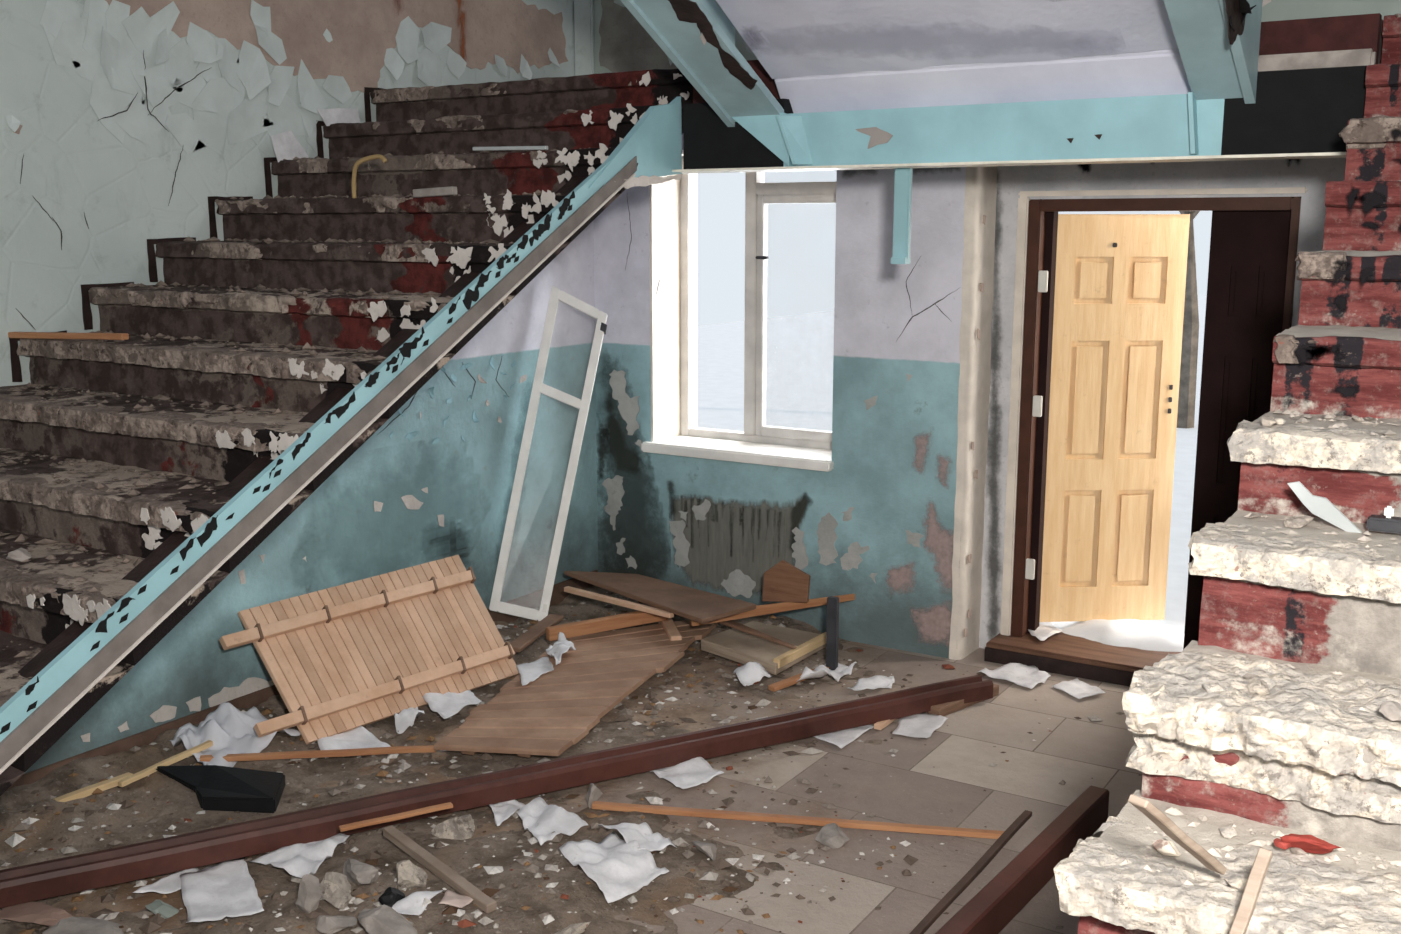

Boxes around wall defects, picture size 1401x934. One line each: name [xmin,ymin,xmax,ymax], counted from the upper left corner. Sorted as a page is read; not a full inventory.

peeling [668,0,757,90]
crack [98,50,212,206]
spalling [1339,115,1401,151]
crack [20,155,89,250]
spalling [0,0,690,494]
crack [896,258,959,342]
spalling [1295,251,1347,281]
spalling [1227,416,1401,474]
spalling [0,468,234,575]
spalling [0,558,147,651]
spalling [1122,652,1401,824]
spalling [1053,816,1401,934]